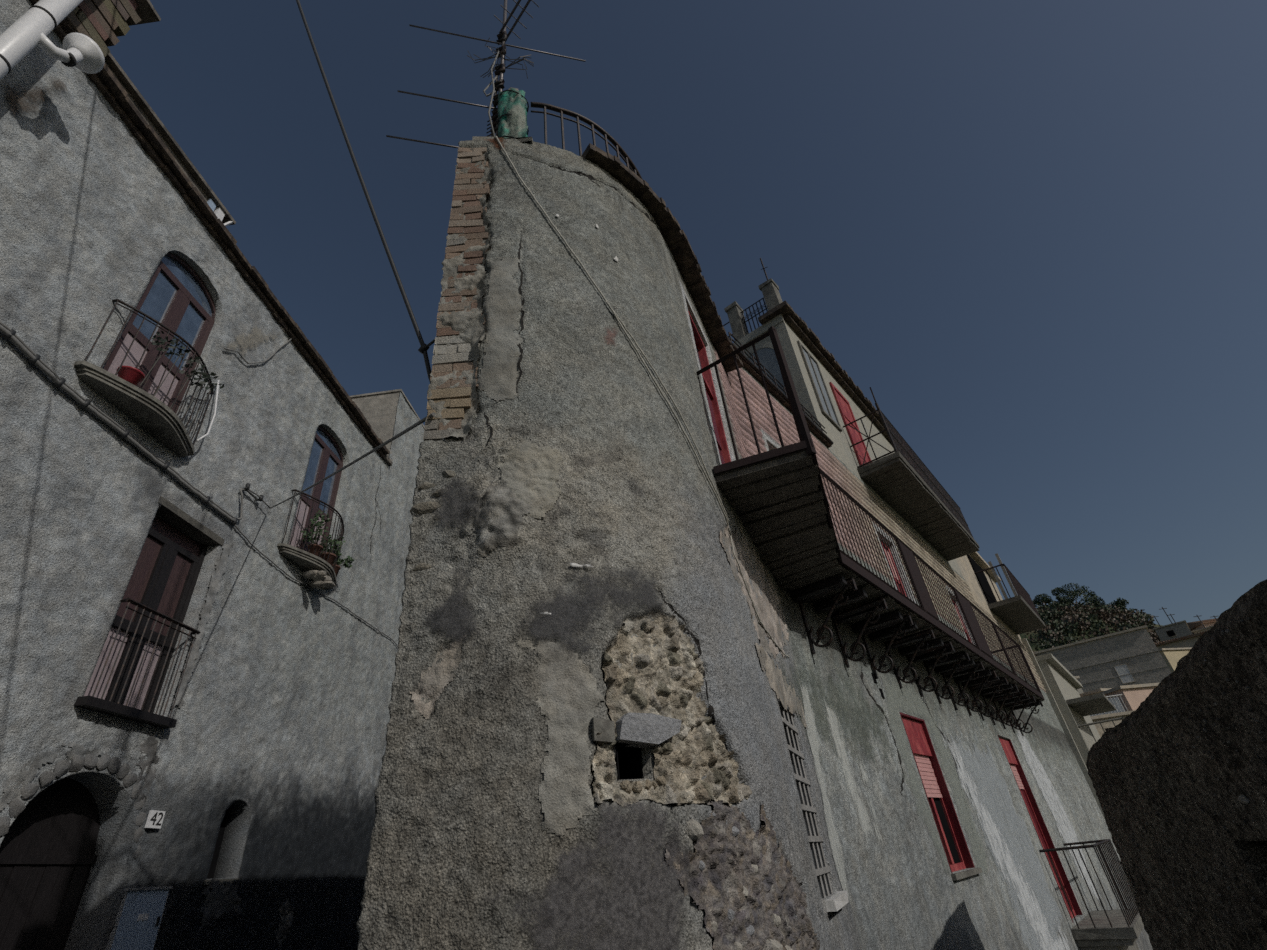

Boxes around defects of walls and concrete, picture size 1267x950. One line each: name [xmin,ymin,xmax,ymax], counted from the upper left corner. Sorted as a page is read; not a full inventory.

spalling [423,147,491,441]
crack [516,231,525,401]
water stain [427,572,476,642]
water stain [521,562,665,652]
spalling [591,609,752,807]
water stain [518,803,692,950]